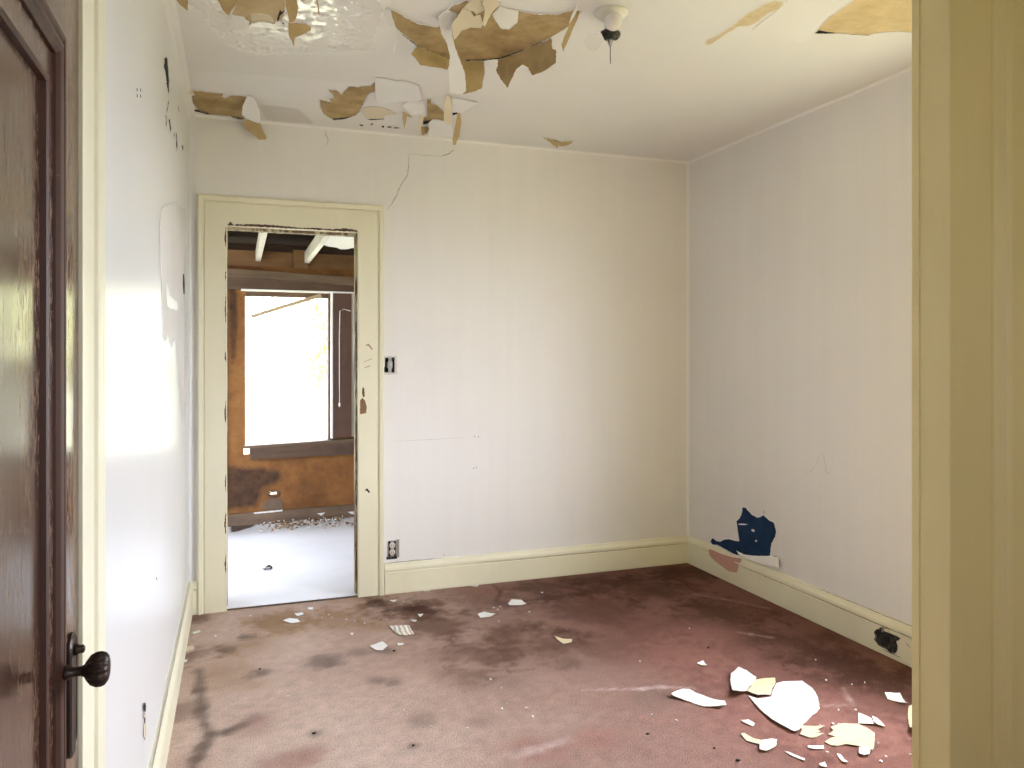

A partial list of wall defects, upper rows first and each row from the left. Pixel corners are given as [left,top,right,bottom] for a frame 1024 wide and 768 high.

peeling [218,0,320,46]
peeling [752,0,912,44]
peeling [318,0,582,145]
peeling [188,89,267,140]
peeling [542,137,575,148]
peeling [709,506,782,572]